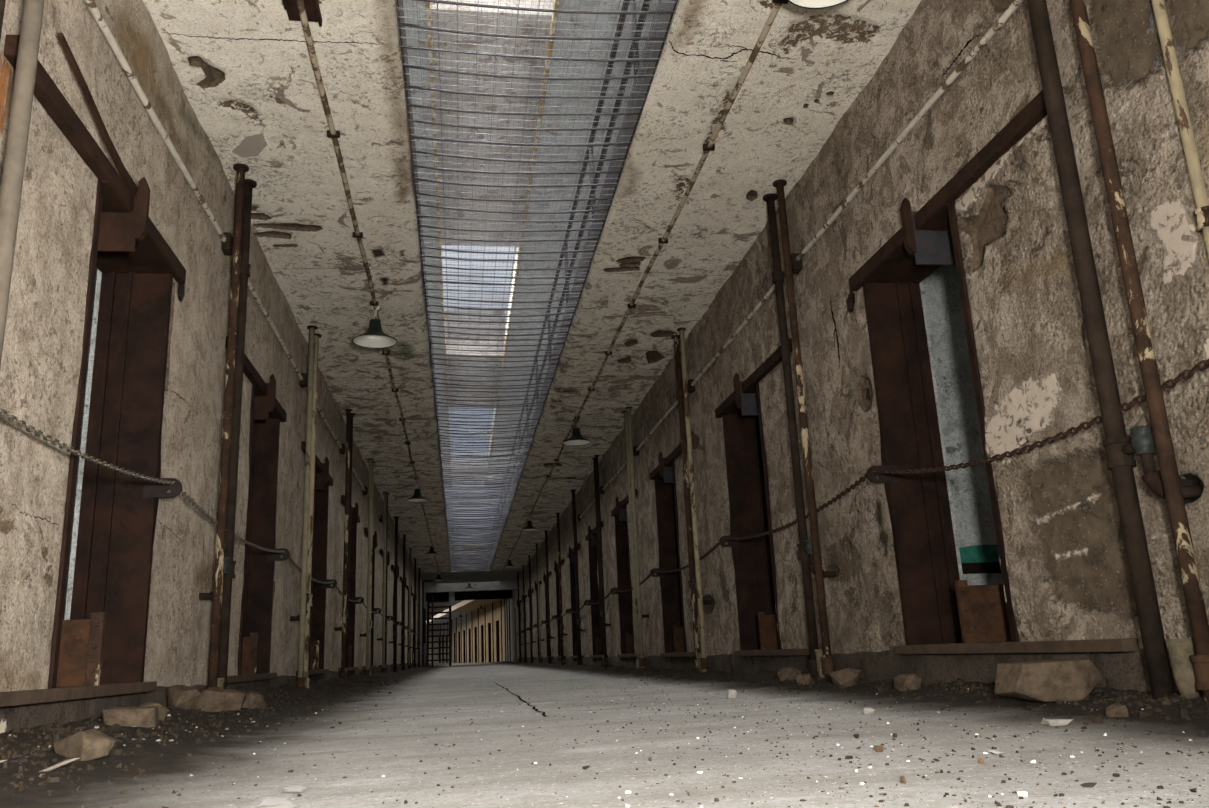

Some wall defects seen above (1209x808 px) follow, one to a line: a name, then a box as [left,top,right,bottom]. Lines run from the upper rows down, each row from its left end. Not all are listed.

crack [669,41,791,62]
peeling [781,14,881,54]
flaking render [1090,0,1209,89]
flaking render [187,56,225,89]
peeling [218,100,267,158]
flaking render [959,185,1011,272]
crack [494,682,546,716]